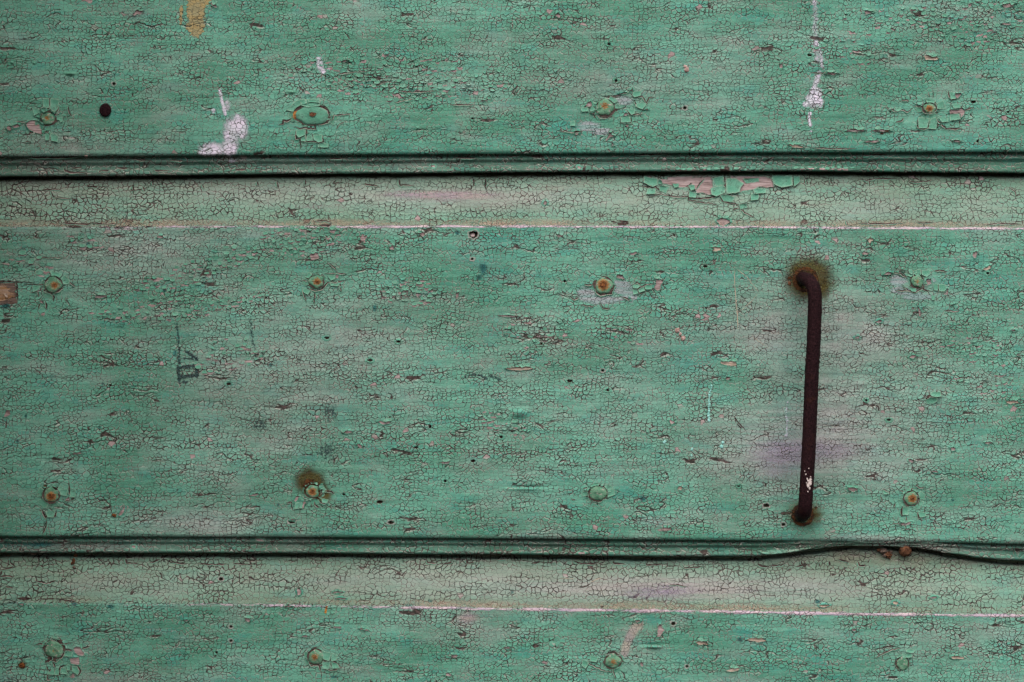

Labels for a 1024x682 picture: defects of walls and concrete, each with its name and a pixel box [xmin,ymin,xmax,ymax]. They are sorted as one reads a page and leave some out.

crack [235,157,417,188]
crack [452,155,520,188]
crack [612,154,664,171]
crack [793,147,932,187]
crack [8,156,184,228]
peeling [640,166,854,227]
crack [845,220,933,228]
crack [984,220,1021,228]
peeling [2,250,75,317]
rust [788,259,830,297]
rust [297,471,330,501]
crack [0,558,72,601]